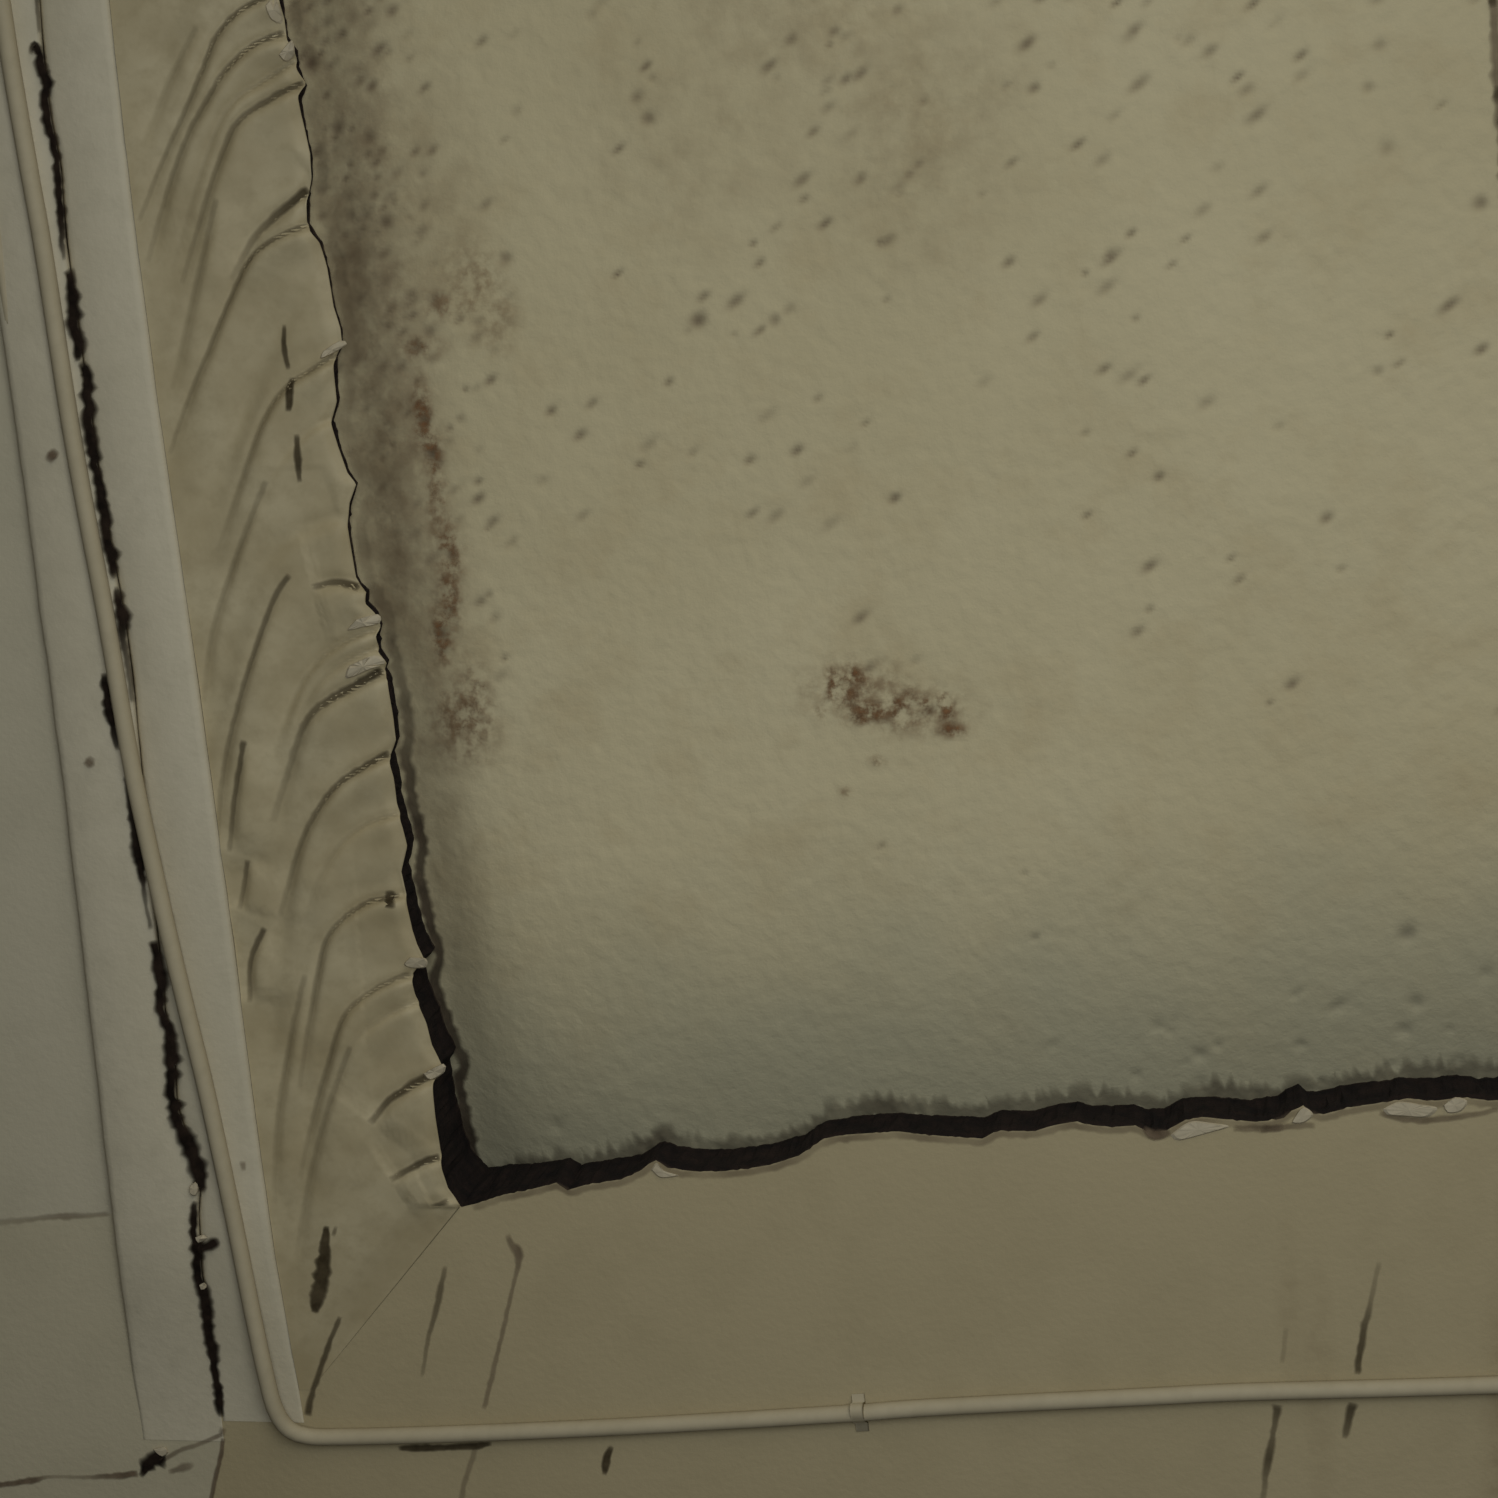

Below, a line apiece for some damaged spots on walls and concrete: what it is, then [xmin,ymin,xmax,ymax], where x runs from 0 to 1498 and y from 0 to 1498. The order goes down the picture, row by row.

crack [30,0,146,897]
rust [828,668,906,721]
rust [924,701,961,735]
crack [150,941,224,1498]
crack [513,1246,522,1262]
crack [306,1227,337,1414]
crack [1345,1323,1367,1428]